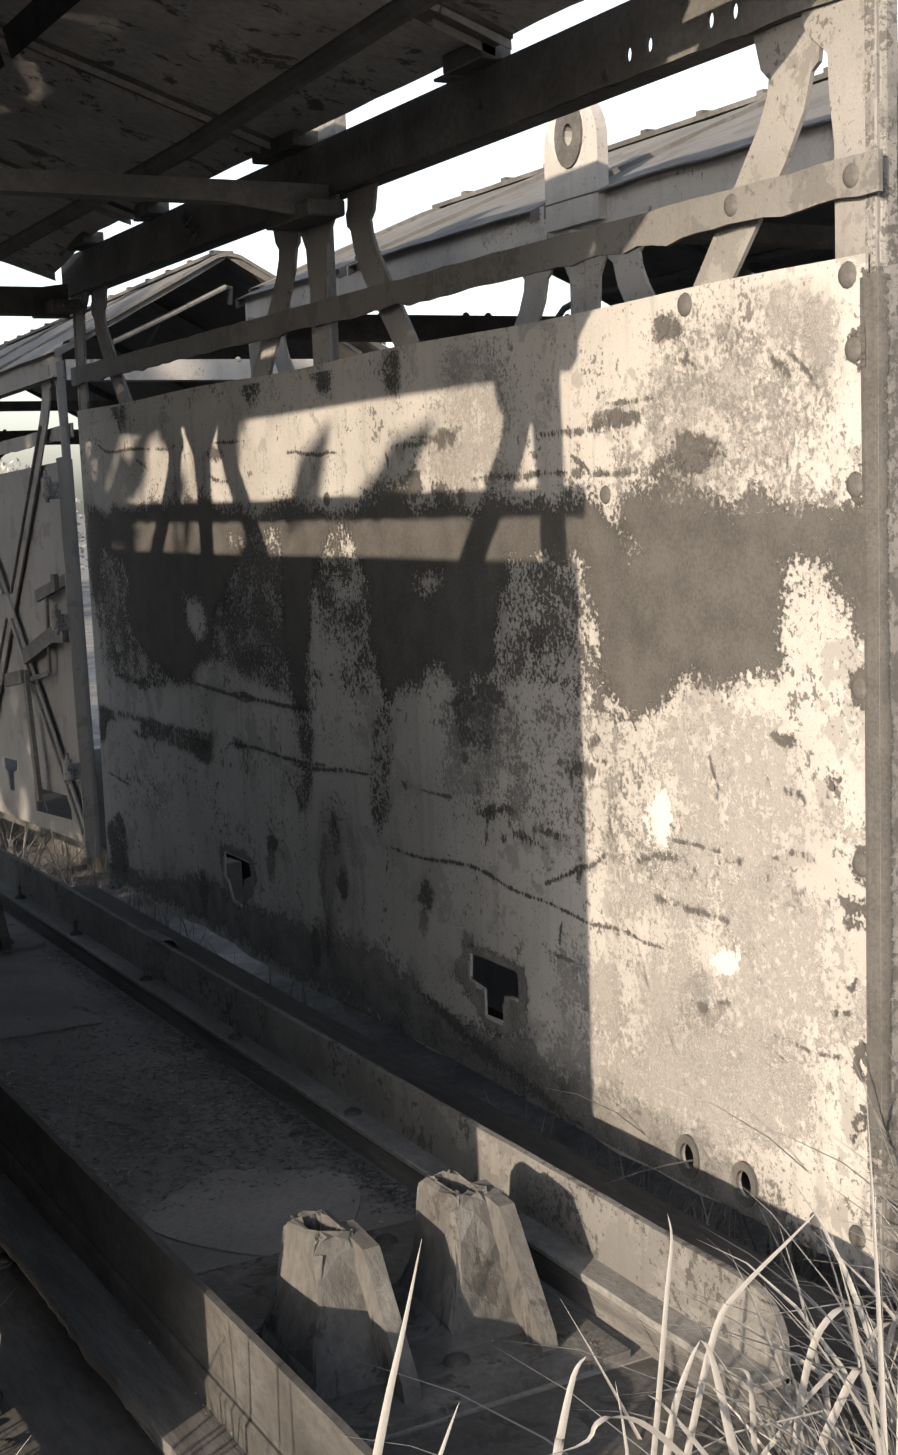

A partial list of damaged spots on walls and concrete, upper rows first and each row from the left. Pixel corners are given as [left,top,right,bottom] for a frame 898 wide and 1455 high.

corrosion [85,266,896,1277]
peeling [436,678,570,853]
peeling [524,678,867,1174]